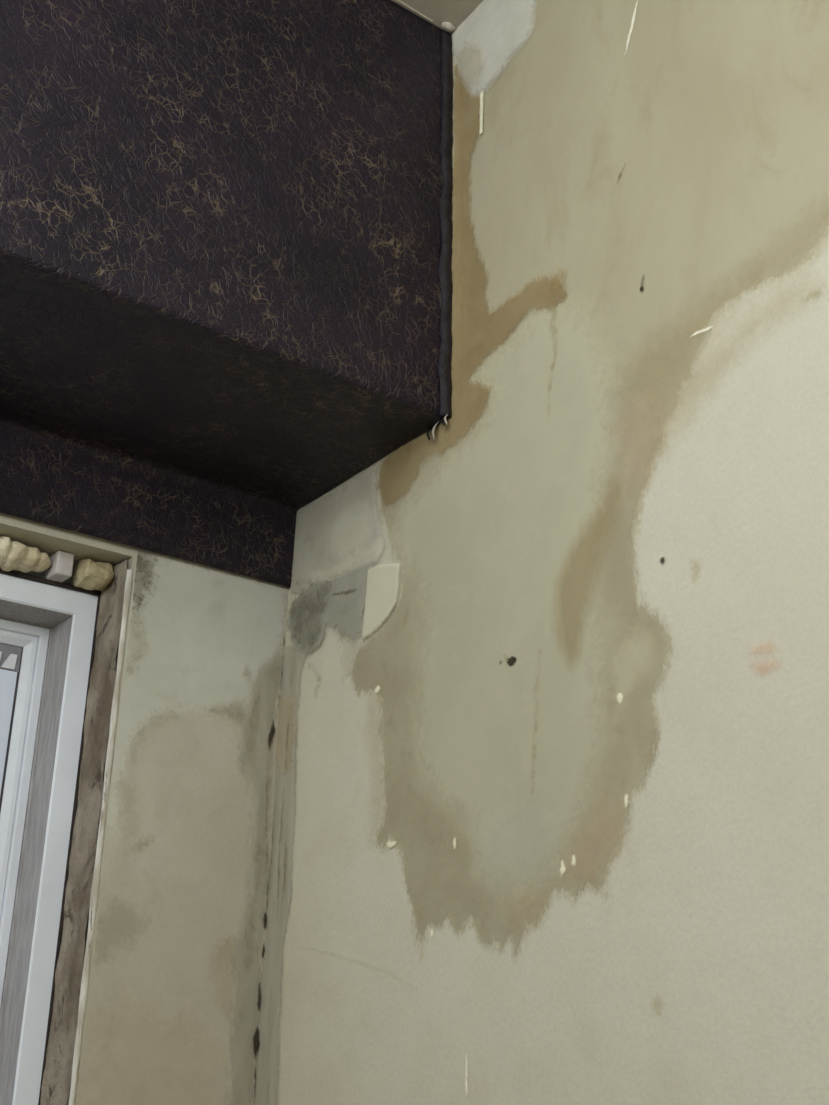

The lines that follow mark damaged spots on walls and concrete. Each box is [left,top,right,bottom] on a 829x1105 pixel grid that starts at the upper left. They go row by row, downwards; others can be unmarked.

peeling [453,0,829,475]
peeling [362,564,399,637]
damp [352,65,671,954]